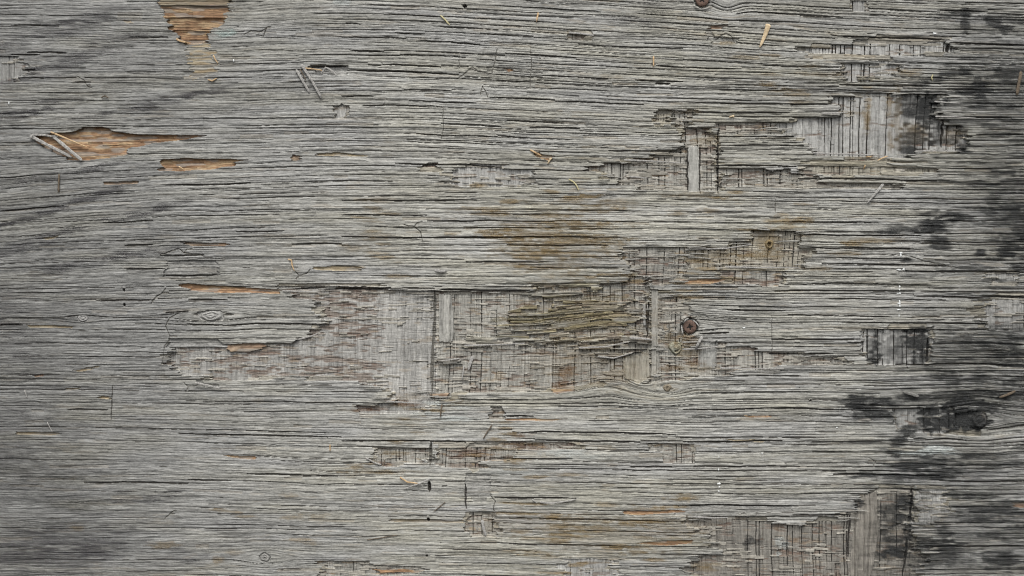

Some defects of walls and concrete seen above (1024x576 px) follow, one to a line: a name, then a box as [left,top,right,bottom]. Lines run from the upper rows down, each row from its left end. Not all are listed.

peeling [584,40,975,194]
water stain [895,69,991,154]
water stain [879,192,1024,289]
peeling [164,226,935,420]
water stain [867,326,932,370]
water stain [846,379,1023,532]
peeling [665,476,952,576]
water stain [878,528,955,567]